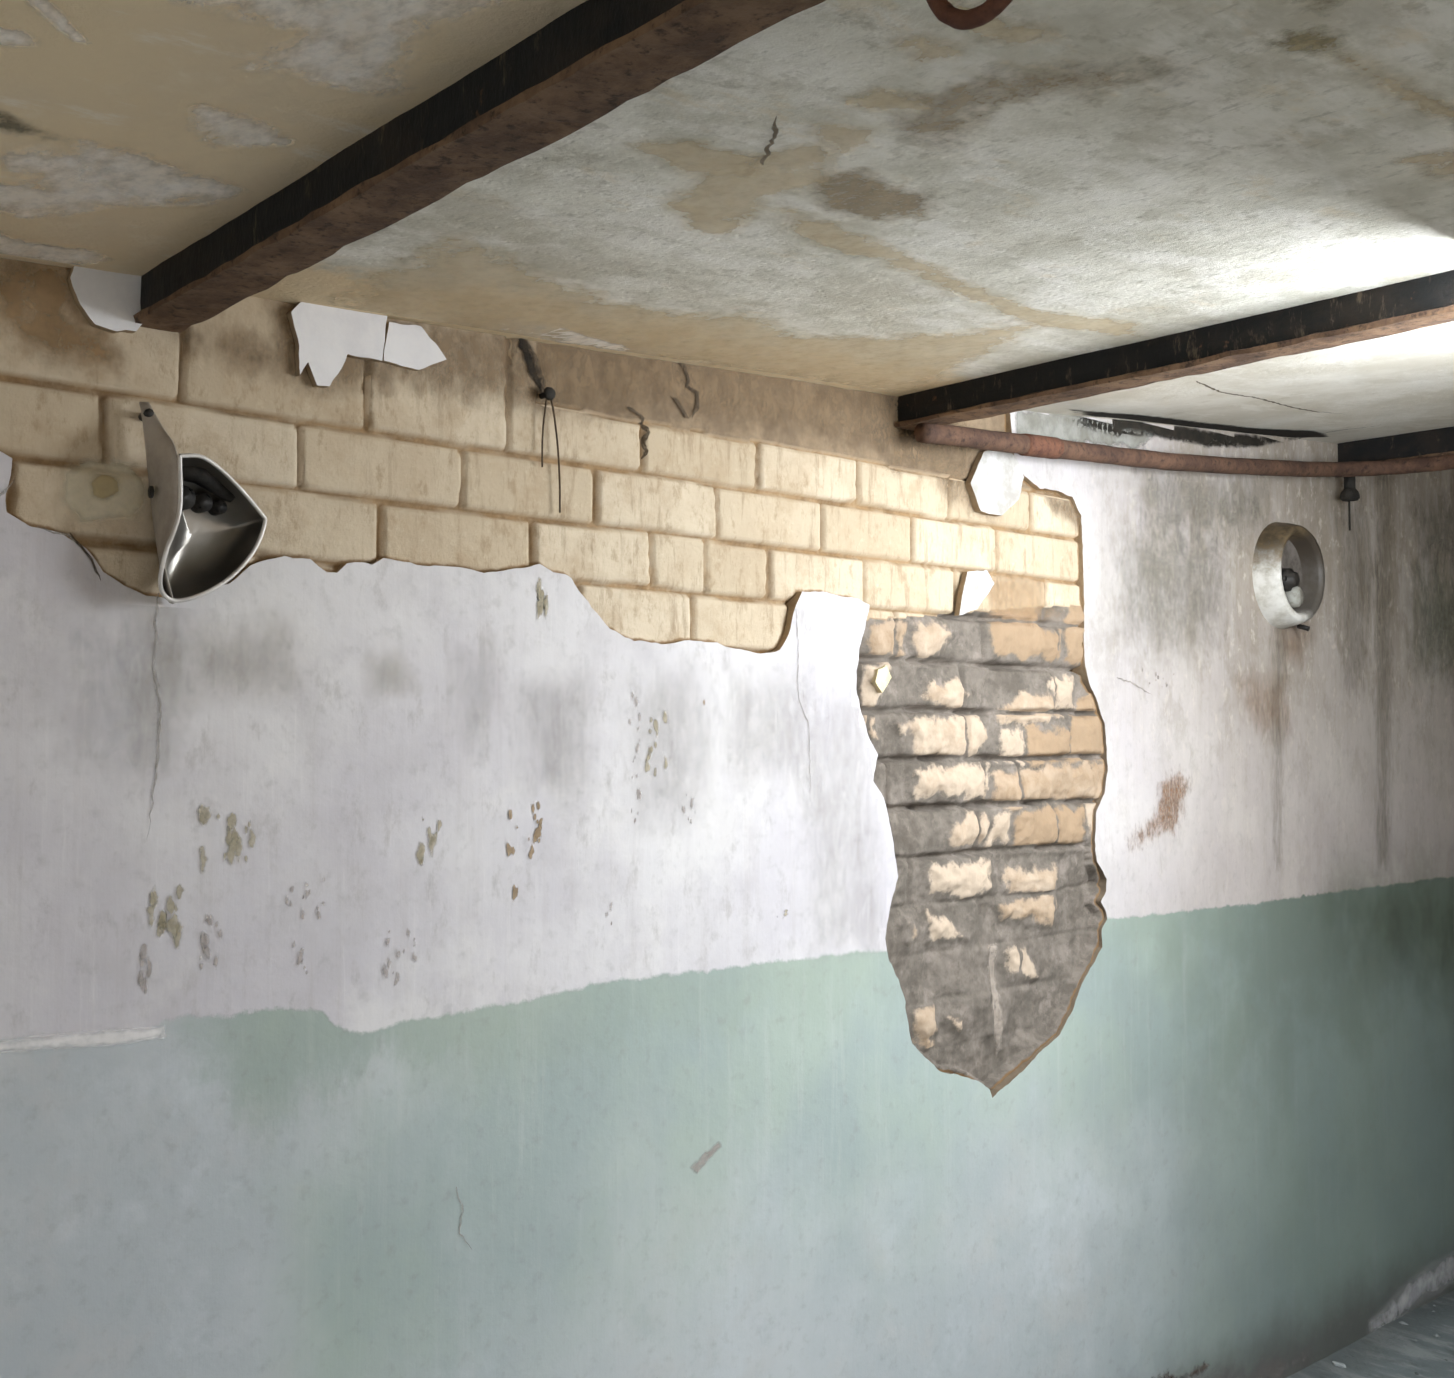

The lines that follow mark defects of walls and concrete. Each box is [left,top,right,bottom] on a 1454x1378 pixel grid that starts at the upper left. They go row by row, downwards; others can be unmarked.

peeling [214,0,487,89]
water stain [0,114,32,133]
peeling [196,106,289,145]
water stain [906,66,1111,134]
peeling [0,142,234,217]
water stain [818,172,924,220]
peeling [789,211,1134,334]
water stain [1072,410,1328,438]
flaking render [0,237,1105,1089]